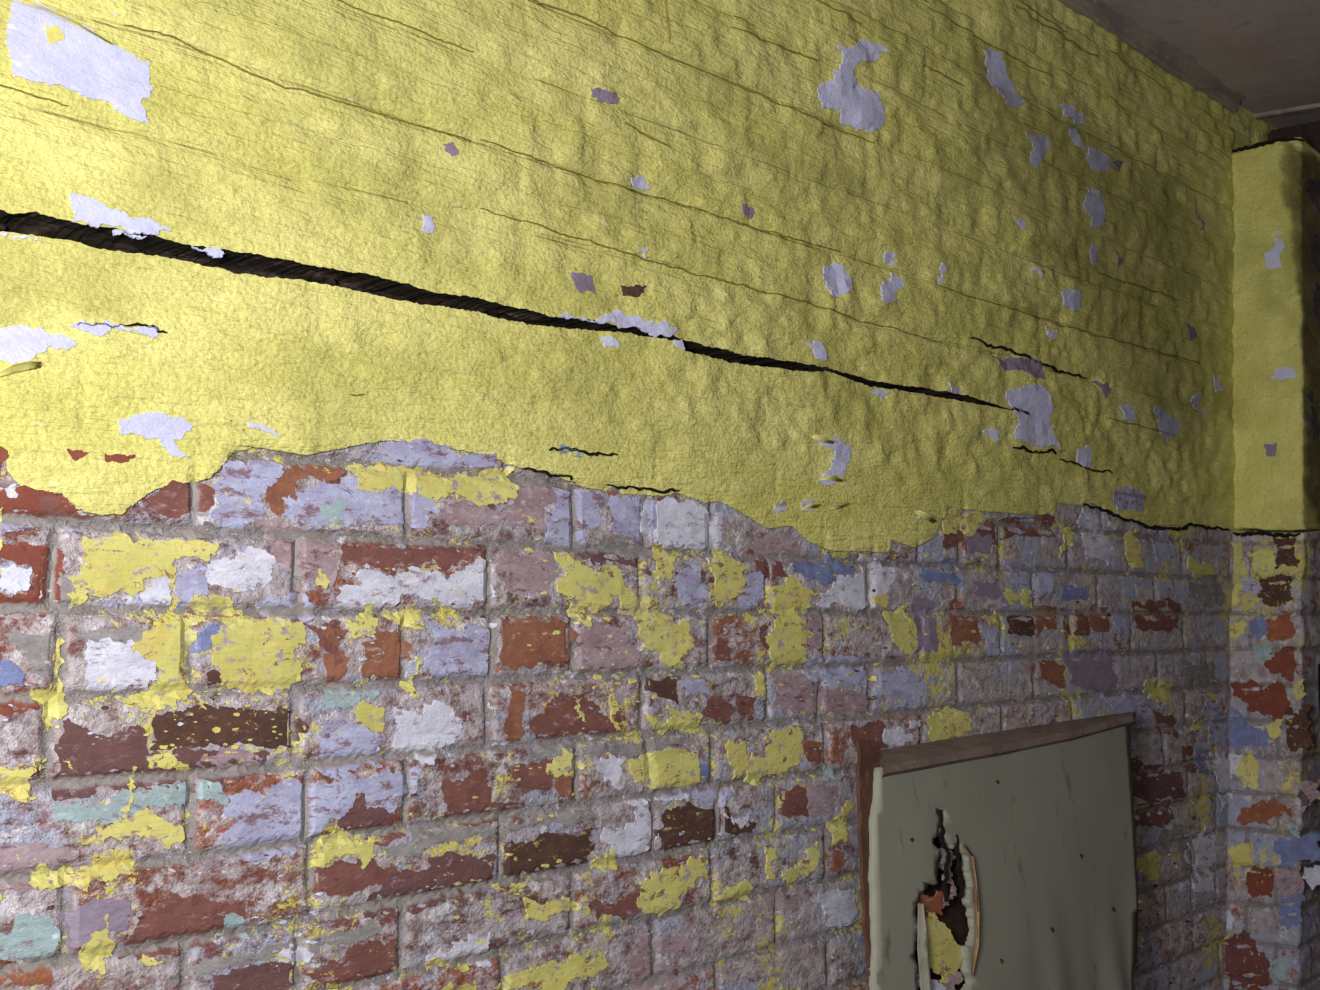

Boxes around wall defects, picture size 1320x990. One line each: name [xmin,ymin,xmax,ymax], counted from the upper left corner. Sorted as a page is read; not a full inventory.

crack [0,84,69,107]
peeling [5,0,153,124]
crack [338,0,474,52]
crack [124,24,841,252]
crack [533,0,875,143]
peeling [817,39,890,133]
peeling [69,193,173,235]
peeling [0,320,161,377]
crack [0,208,1113,473]
peeling [118,412,194,458]
peeling [983,356,1061,451]
crack [1083,503,1301,538]